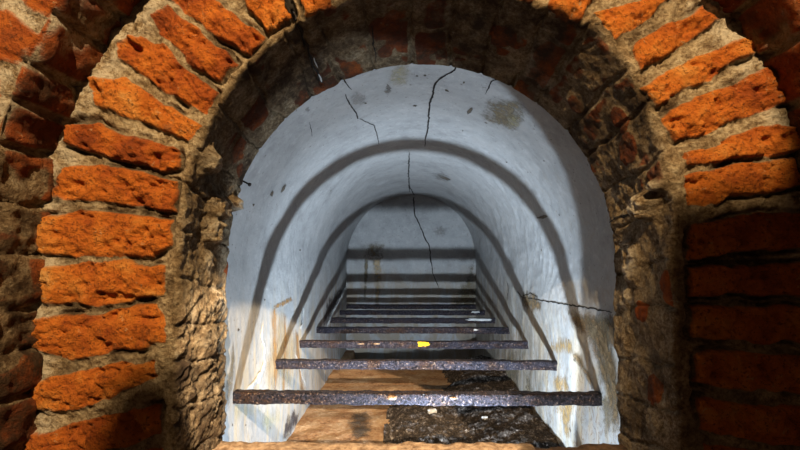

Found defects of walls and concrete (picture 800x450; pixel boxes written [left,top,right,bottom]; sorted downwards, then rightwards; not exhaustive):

crack [344,80,379,144]
leakage [486,102,522,126]
crack [407,67,456,285]
rust [268,297,303,390]